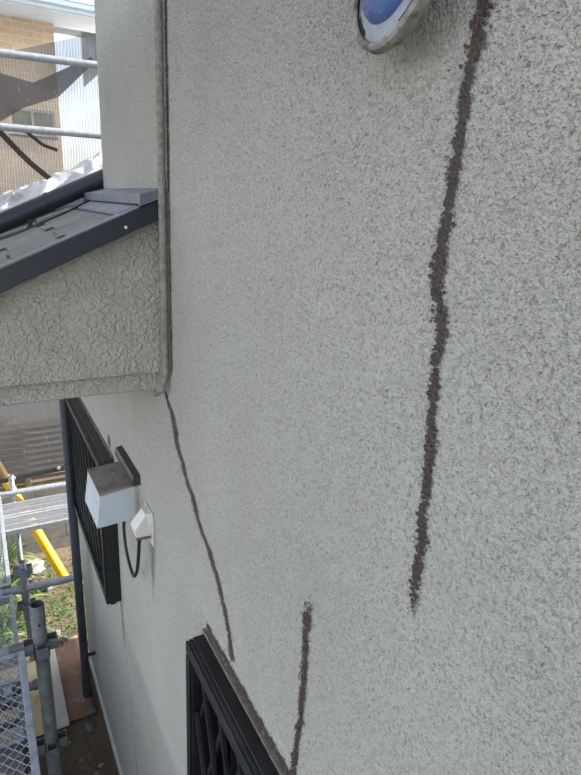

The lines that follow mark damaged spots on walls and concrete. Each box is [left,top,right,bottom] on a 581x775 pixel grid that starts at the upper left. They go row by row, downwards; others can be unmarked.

crack [407,0,498,631]
crack [165,390,234,662]
crack [290,595,315,775]